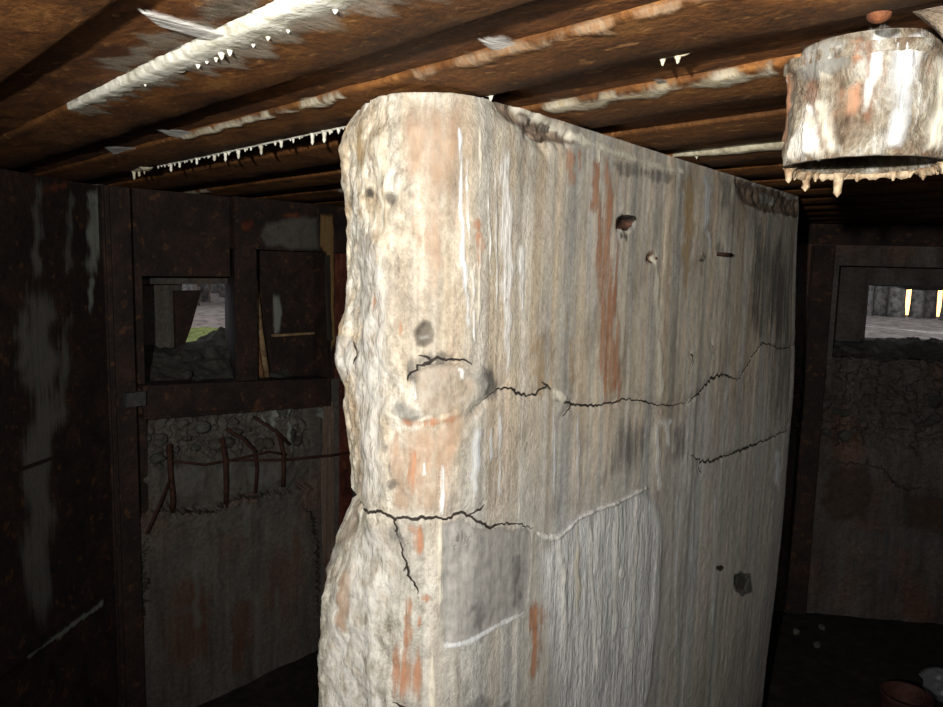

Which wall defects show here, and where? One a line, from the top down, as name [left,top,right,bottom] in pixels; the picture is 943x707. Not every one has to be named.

efflorescence [574,17,613,36]
efflorescence [634,4,656,19]
efflorescence [67,0,387,114]
efflorescence [457,38,540,68]
efflorescence [158,111,274,139]
efflorescence [105,147,135,155]
efflorescence [131,126,346,180]
crack [407,355,472,381]
crack [473,342,794,415]
crack [691,424,789,472]
crack [359,501,533,594]
rust [393,608,421,694]